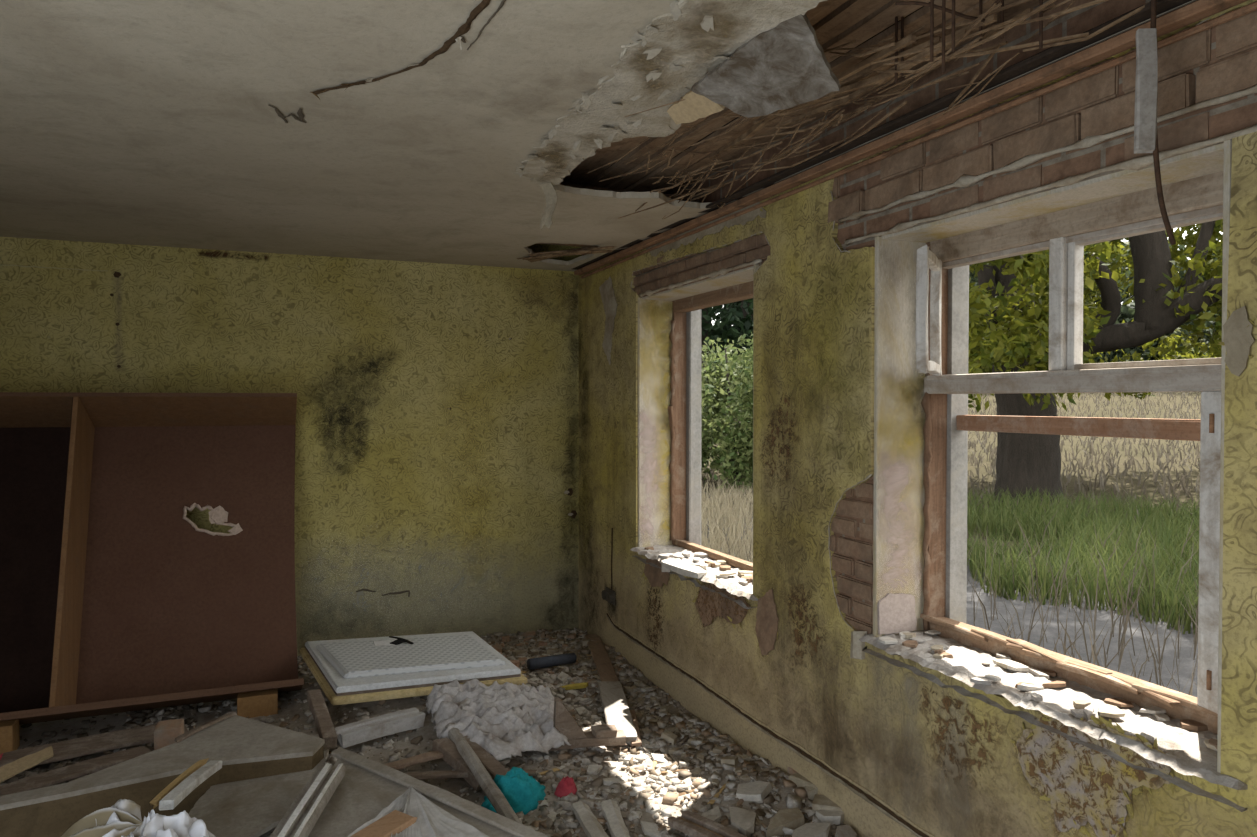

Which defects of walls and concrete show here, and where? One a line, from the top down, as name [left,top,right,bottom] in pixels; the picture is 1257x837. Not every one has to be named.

crack [269,0,506,123]
flaking render [513,0,827,186]
flaking render [633,202,771,296]
peeling [1219,306,1255,376]
flaking render [692,578,825,666]
flaking render [828,461,917,660]